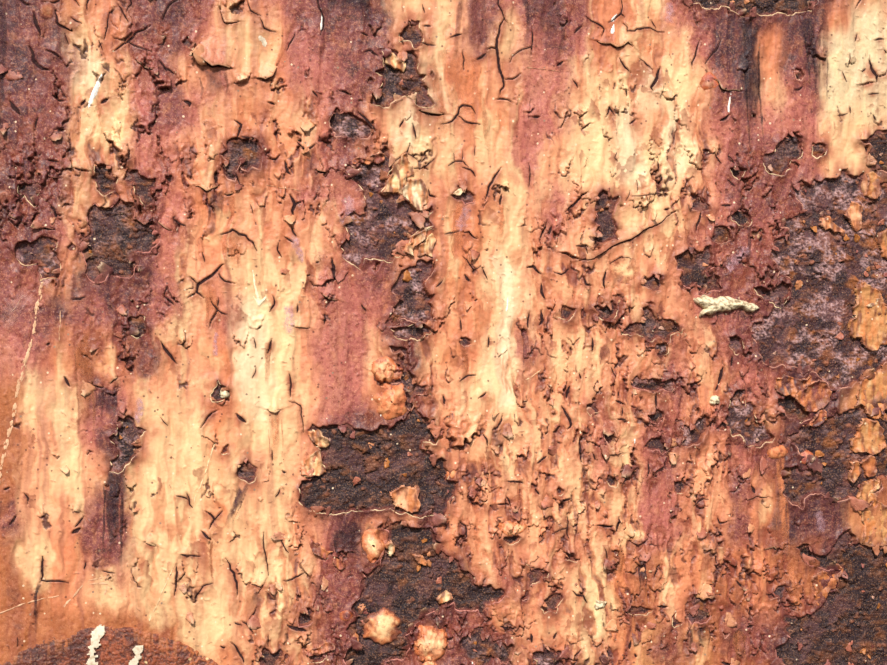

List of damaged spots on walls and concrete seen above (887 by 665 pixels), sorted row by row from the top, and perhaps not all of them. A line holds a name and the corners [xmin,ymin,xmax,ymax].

crack [20,0,89,70]
rust [368,19,435,109]
crack [421,0,533,102]
crack [574,0,660,124]
crack [527,163,676,328]
rust [751,130,887,390]
peeling [847,281,887,352]
peeling [389,485,421,513]
rust [299,347,515,665]
peeling [774,374,832,427]
rust [771,397,887,665]
peeling [847,365,887,547]